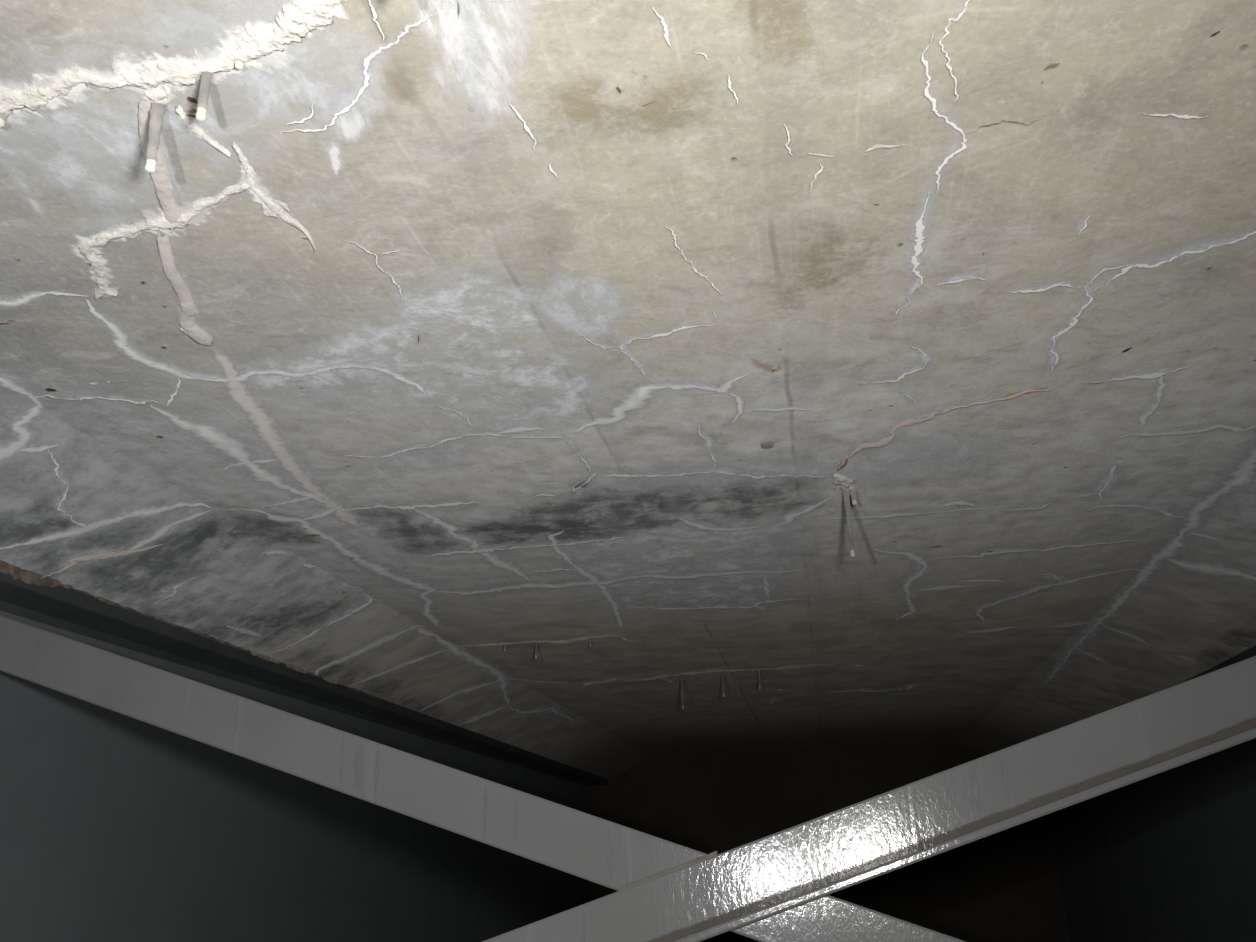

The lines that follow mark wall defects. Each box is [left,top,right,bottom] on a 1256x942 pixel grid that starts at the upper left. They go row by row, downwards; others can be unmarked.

water stain [0,518,69,540]
water stain [0,0,621,535]
crack [0,0,1256,726]
water stain [484,438,989,612]